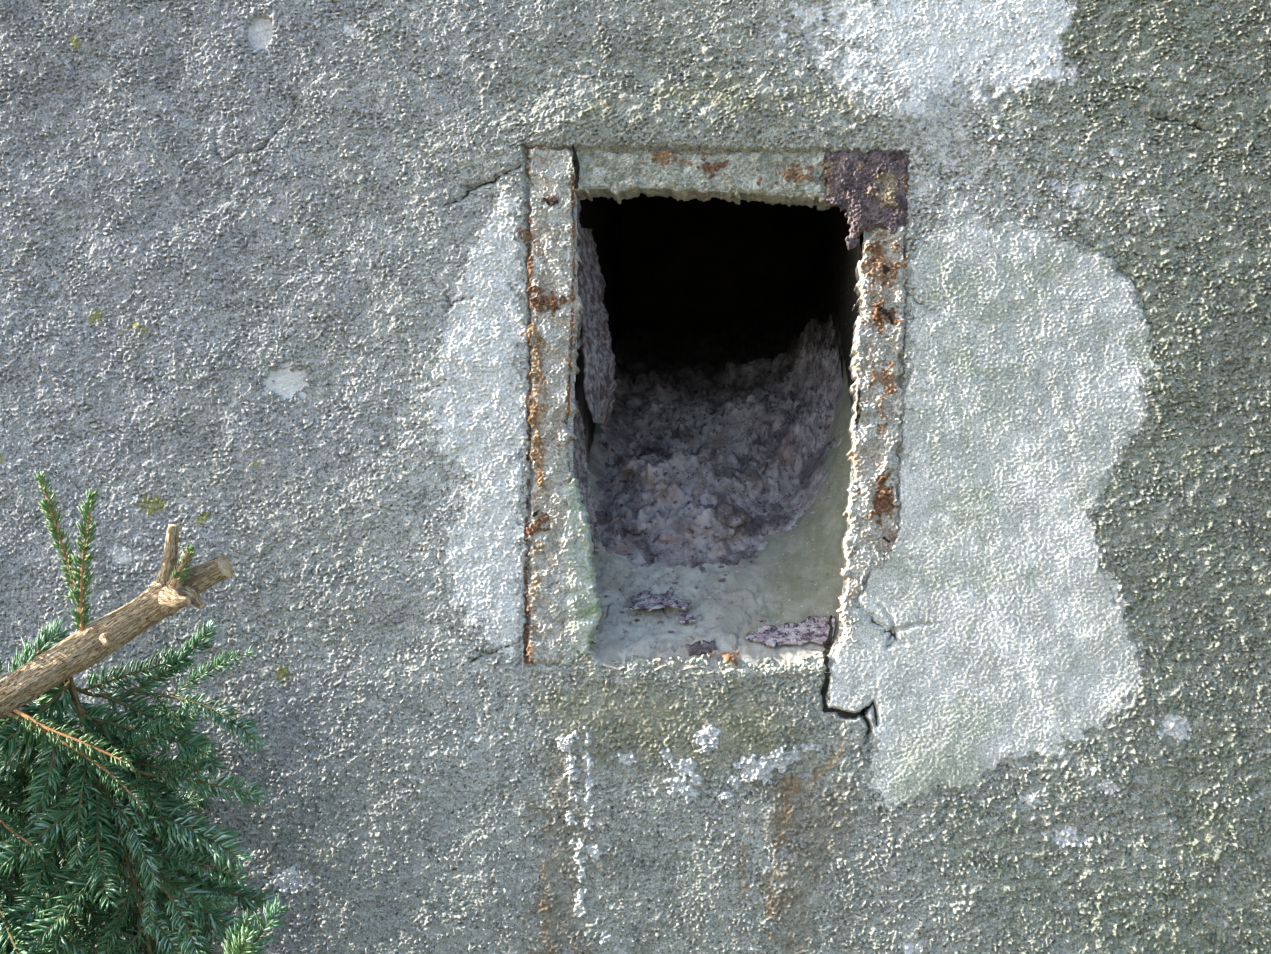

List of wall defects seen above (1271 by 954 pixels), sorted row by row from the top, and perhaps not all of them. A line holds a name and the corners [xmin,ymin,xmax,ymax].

crack [445,164,521,205]
rust [860,229,907,334]
spalling [261,361,310,399]
rust [516,175,576,665]
peeling [528,145,834,684]
peeling [839,226,909,643]
rust [869,360,903,434]
rust [856,468,901,525]
crack [821,615,877,744]
water stain [660,725,721,804]
water stain [718,742,825,803]
water stain [555,725,627,954]